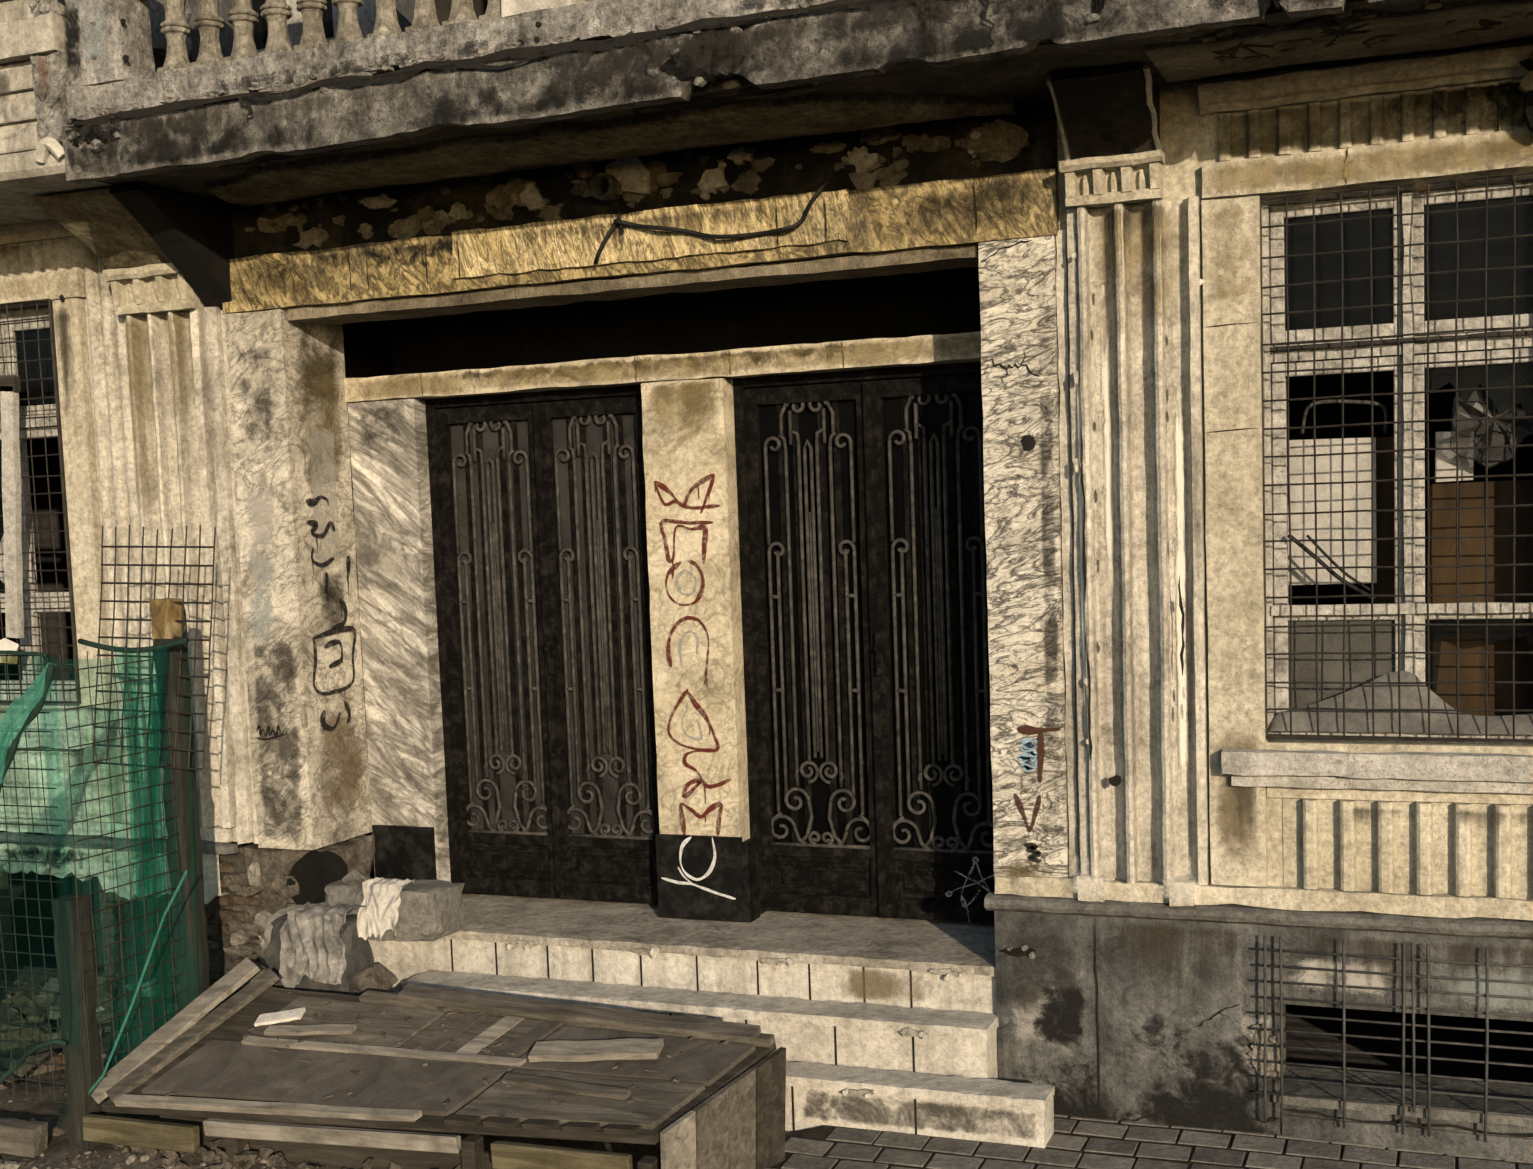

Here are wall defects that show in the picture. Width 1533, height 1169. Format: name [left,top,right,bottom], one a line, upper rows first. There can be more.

spalling [473,22,581,57]
spalling [608,28,633,38]
spalling [1086,0,1106,24]
spalling [1190,0,1397,64]
spalling [65,56,450,152]
spalling [213,144,376,167]
flaking render [605,147,776,208]
flaking render [795,118,1030,190]
flaking render [245,172,592,250]
leakage [1016,936,1084,1046]
leakage [1047,1018,1279,1134]